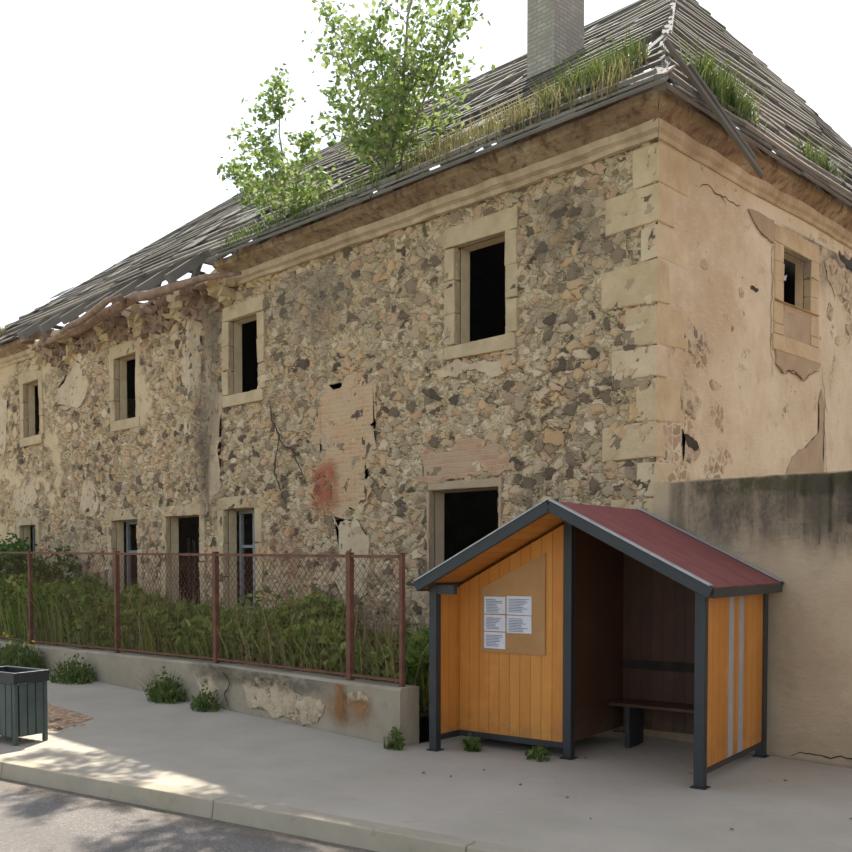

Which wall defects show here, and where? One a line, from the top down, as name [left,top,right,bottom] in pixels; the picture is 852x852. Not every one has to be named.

spalling [824,251,852,321]
spalling [683,322,715,358]
crack [700,184,827,474]
flaking render [774,349,821,380]
spalling [682,429,701,464]
flaking render [786,390,825,474]
leakage [690,474,809,533]
spalling [193,674,220,695]
spalling [239,675,326,726]